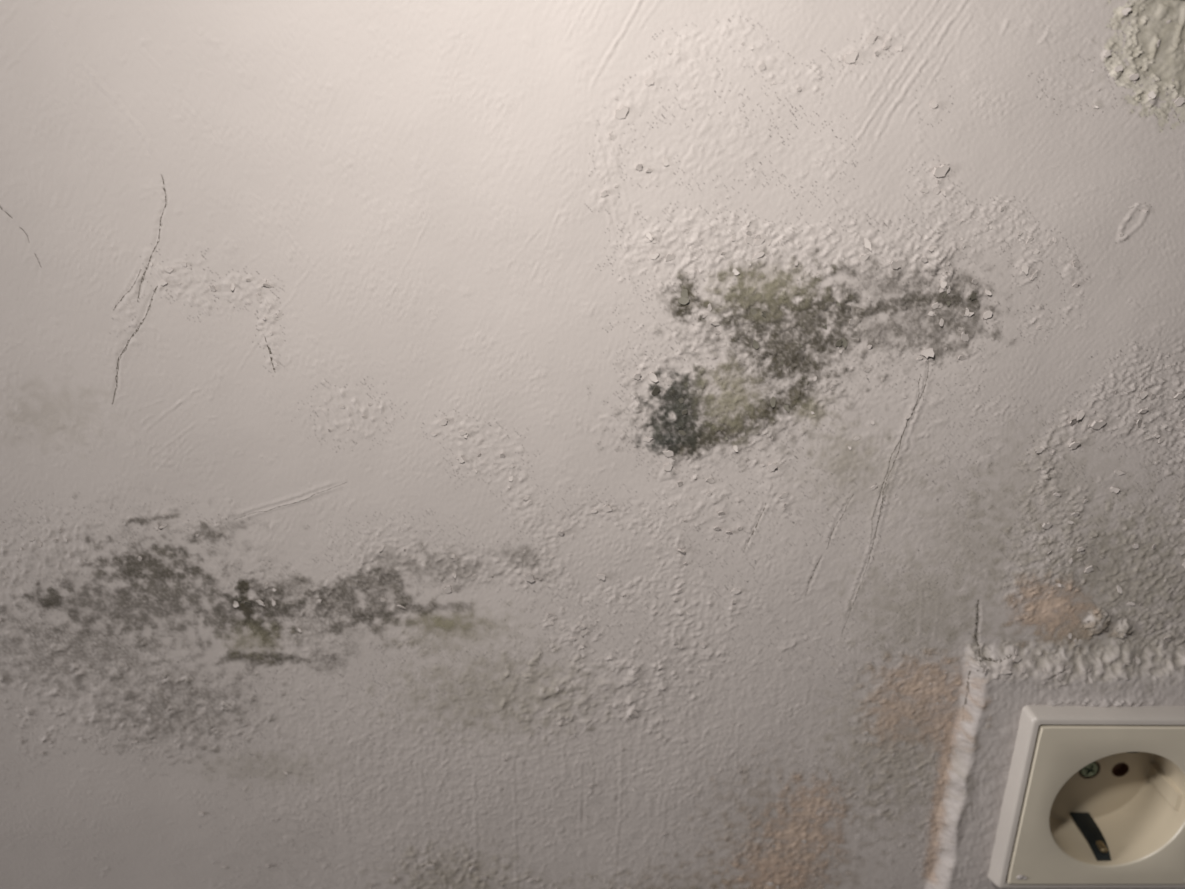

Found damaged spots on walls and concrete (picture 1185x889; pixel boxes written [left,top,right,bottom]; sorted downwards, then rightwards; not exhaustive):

flaking render [1104,0,1185,132]
crack [112,175,167,404]
peeling [109,244,286,377]
mould [651,275,844,454]
peeling [587,155,1090,543]
peeling [421,409,554,533]
mould [98,545,210,595]
mould [229,581,303,664]
peeling [841,461,1185,889]
flaking render [734,788,831,889]